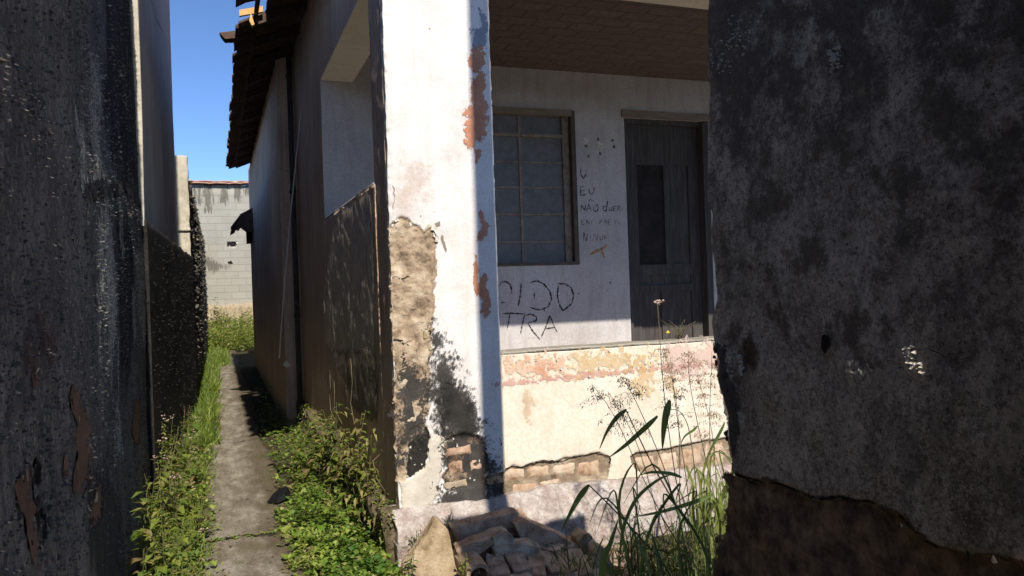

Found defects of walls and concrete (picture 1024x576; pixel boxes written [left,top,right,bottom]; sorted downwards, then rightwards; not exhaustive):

peeling [463,7,490,164]
peeling [473,255,491,318]
spalling [386,215,447,482]
spalling [31,456,52,549]
damp [406,378,491,478]
flaking render [442,433,610,496]
spalling [631,340,1024,576]